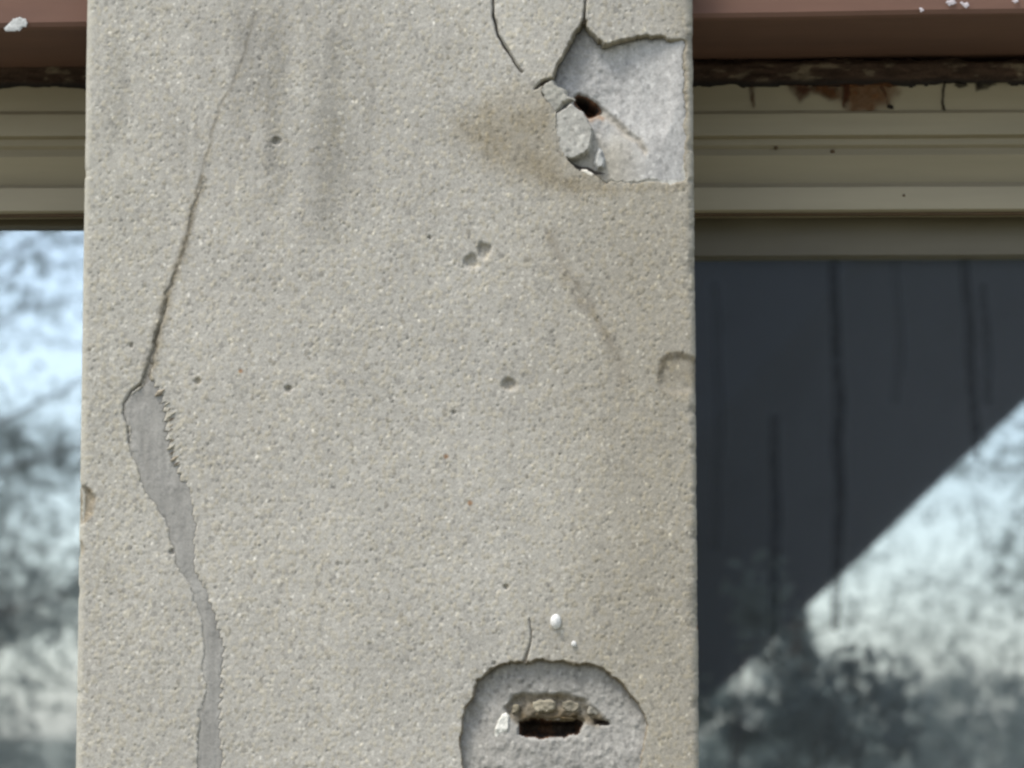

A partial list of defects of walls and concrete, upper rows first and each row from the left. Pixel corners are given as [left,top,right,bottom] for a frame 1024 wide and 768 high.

crack [492,0,520,71]
spalling [536,26,686,185]
corrosion [790,83,893,111]
crack [123,307,225,768]
spalling [460,659,647,768]